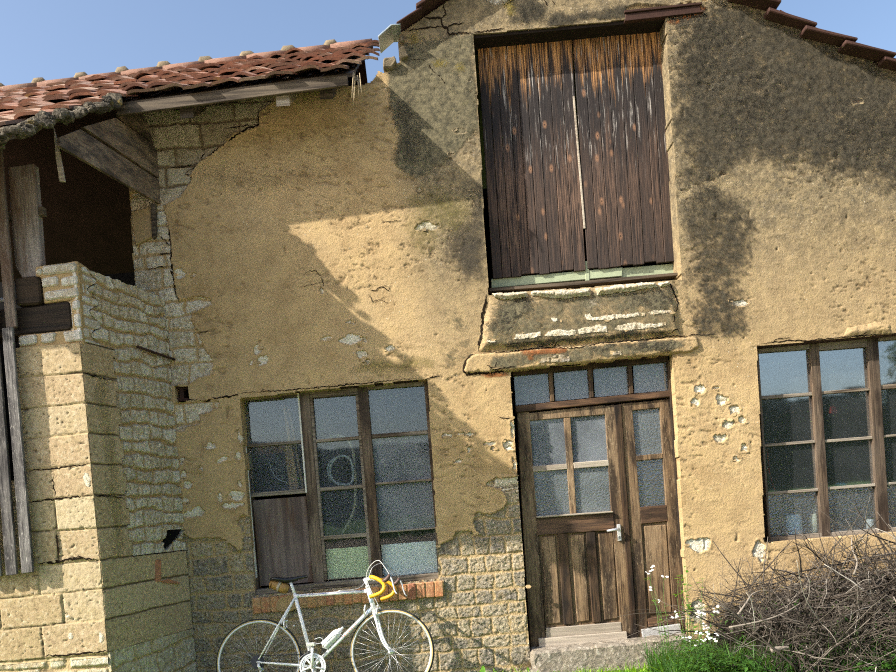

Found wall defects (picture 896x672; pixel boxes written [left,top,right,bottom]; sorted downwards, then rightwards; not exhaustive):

crack [406,0,504,35]
mould [669,4,896,339]
peeling [131,97,274,386]
damp [447,194,485,275]
flaking render [321,320,370,364]
crack [462,282,712,376]
crack [188,376,439,402]
flaking render [691,385,748,442]
peeling [162,416,531,672]